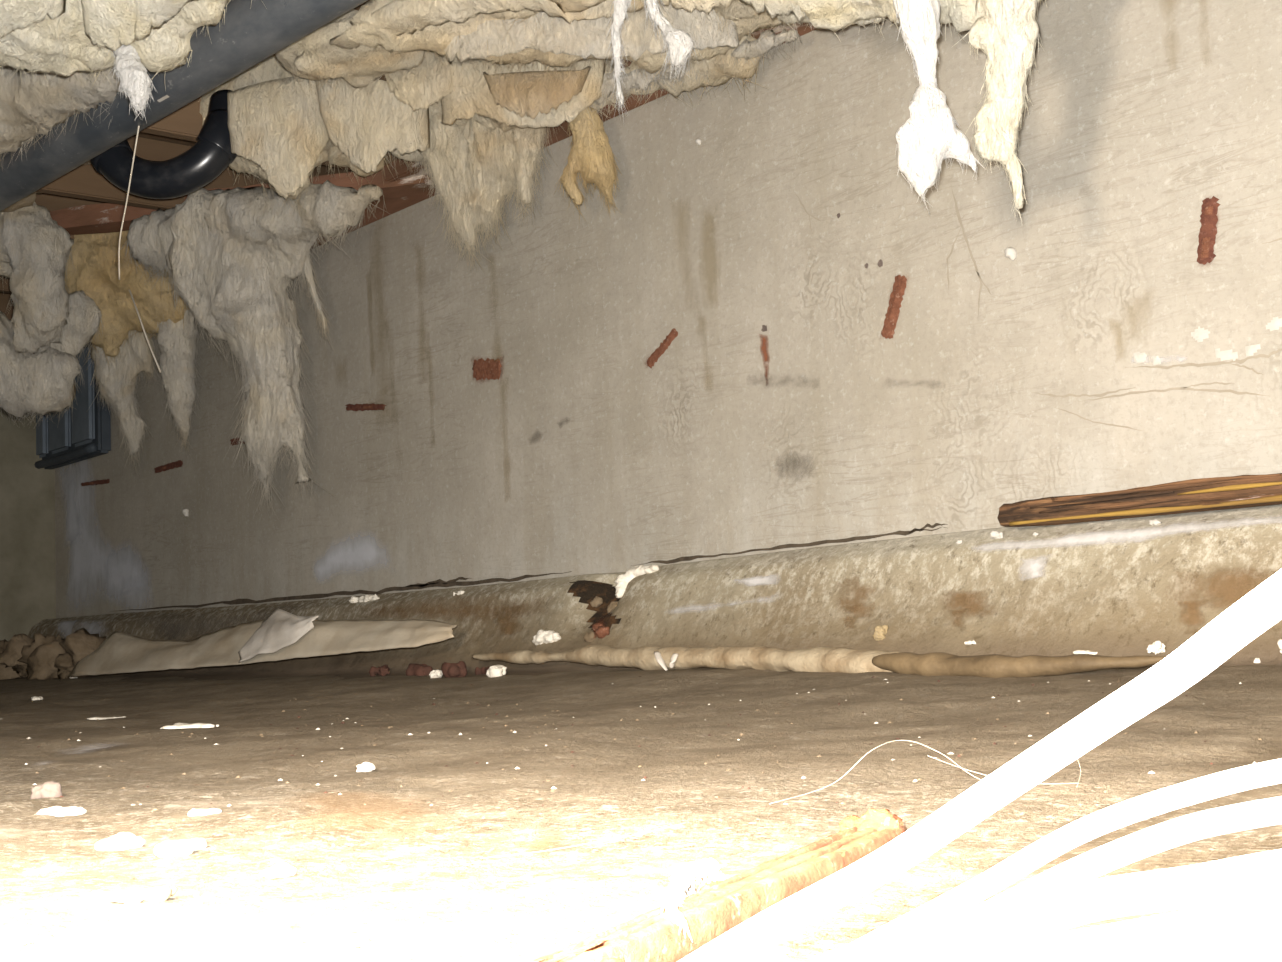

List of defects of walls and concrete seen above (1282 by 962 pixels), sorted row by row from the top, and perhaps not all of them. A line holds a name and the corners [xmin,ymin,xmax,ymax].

rust [1197,196,1221,265]
rust [881,275,907,339]
rust [472,358,502,381]
rust [647,328,678,369]
rust [761,325,769,378]
rust [345,403,386,411]
crack [632,523,948,566]
spalling [567,580,621,642]